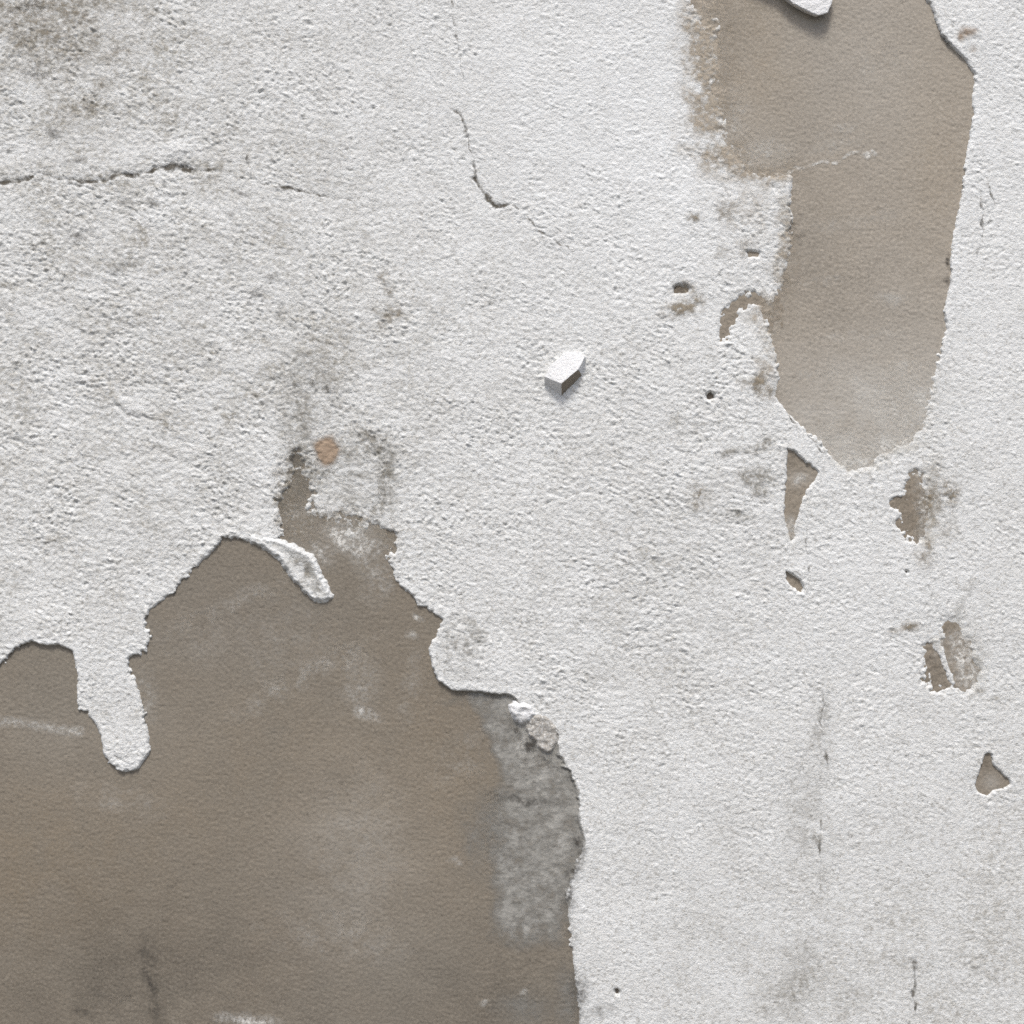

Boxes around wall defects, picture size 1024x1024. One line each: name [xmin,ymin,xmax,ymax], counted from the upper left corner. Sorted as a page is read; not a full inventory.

crack [0,175,34,185]
crack [77,163,214,186]
crack [453,110,569,248]
peeling [683,0,974,471]
spalling [784,449,818,540]
spalling [889,469,939,546]
spalling [920,620,981,692]
peeling [0,448,585,1024]
spalling [975,753,1010,795]